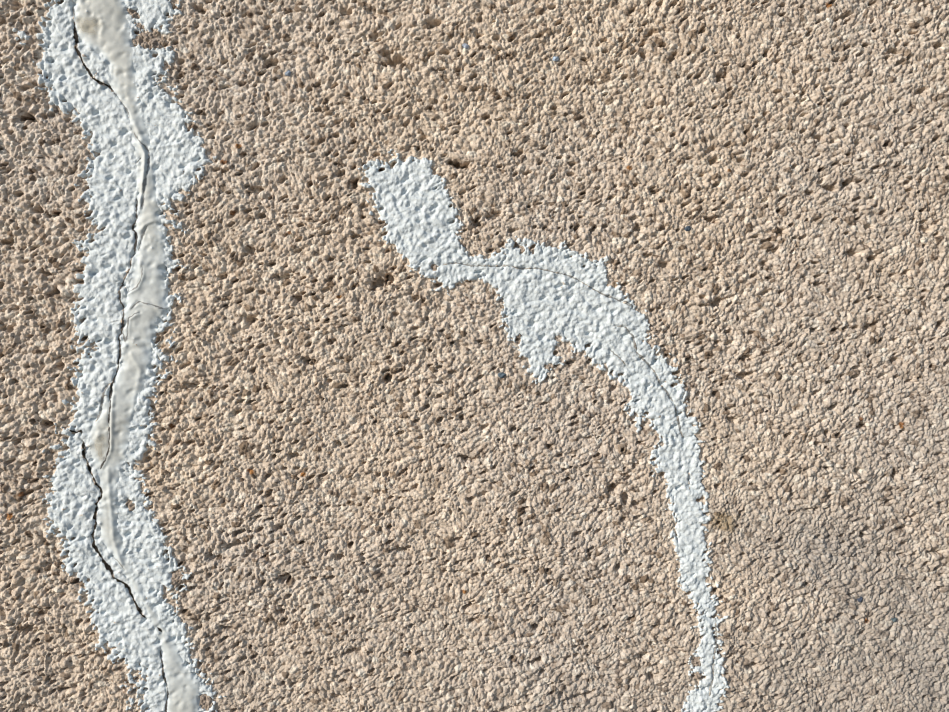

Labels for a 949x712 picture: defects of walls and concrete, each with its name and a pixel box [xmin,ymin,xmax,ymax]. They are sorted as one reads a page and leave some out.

crack [68,6,169,712]